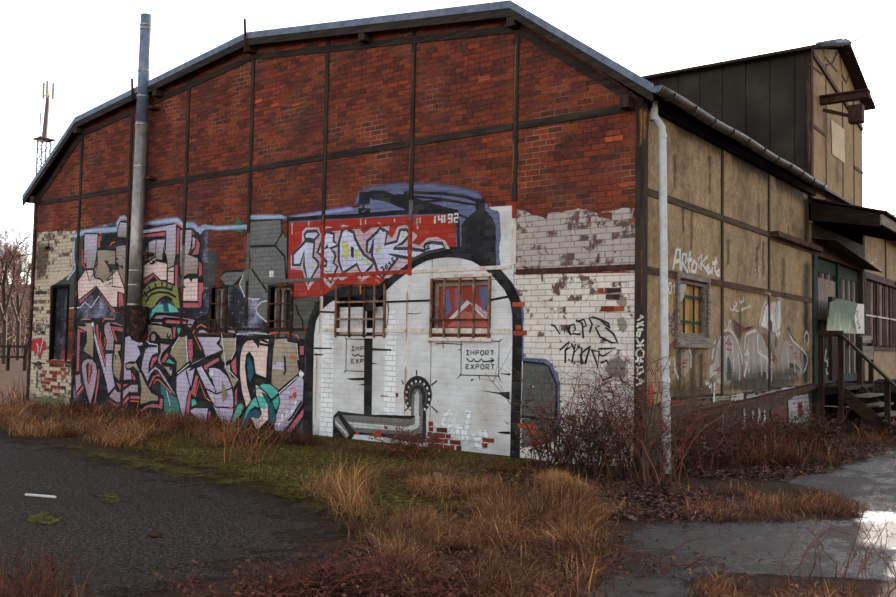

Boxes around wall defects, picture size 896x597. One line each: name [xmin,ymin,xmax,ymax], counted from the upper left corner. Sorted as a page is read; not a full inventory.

spalling [597,287,624,312]
peeling [41,360,71,396]
peeling [426,421,461,451]